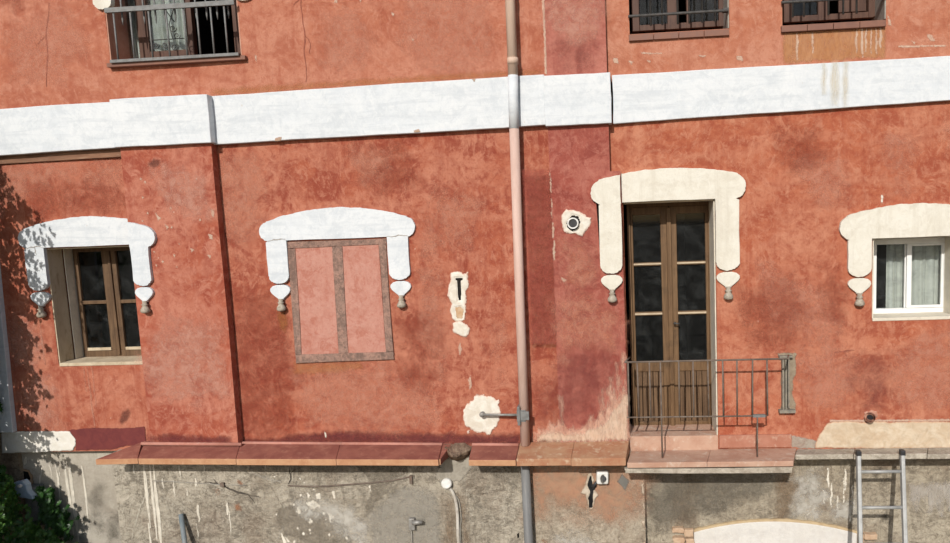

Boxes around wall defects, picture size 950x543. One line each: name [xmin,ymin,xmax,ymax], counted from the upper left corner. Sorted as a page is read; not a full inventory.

crack [295,0,311,80]
corrosion [783,28,885,62]
spalling [447,271,470,353]
damp [70,410,229,450]
spalling [445,377,501,461]
peeling [534,353,630,442]
damp [39,462,89,542]
damp [133,464,181,543]
crack [208,480,261,503]
hole [581,473,599,509]